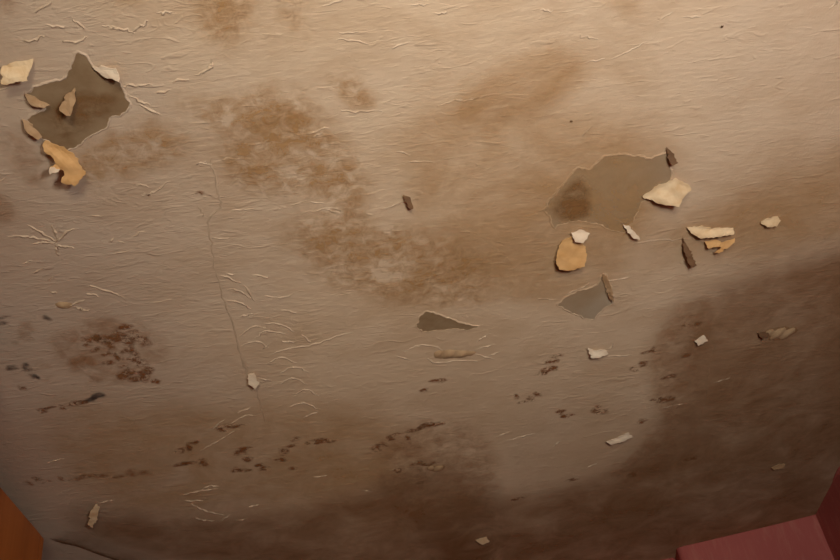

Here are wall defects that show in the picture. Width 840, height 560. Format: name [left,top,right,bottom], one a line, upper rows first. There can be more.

peeling [0,50,132,186]
peeling [542,148,735,271]
peeling [761,216,781,227]
peeling [556,273,615,321]
peeling [414,310,480,333]
water stain [344,258,840,560]
peeling [607,433,633,445]
peeling [88,504,100,528]